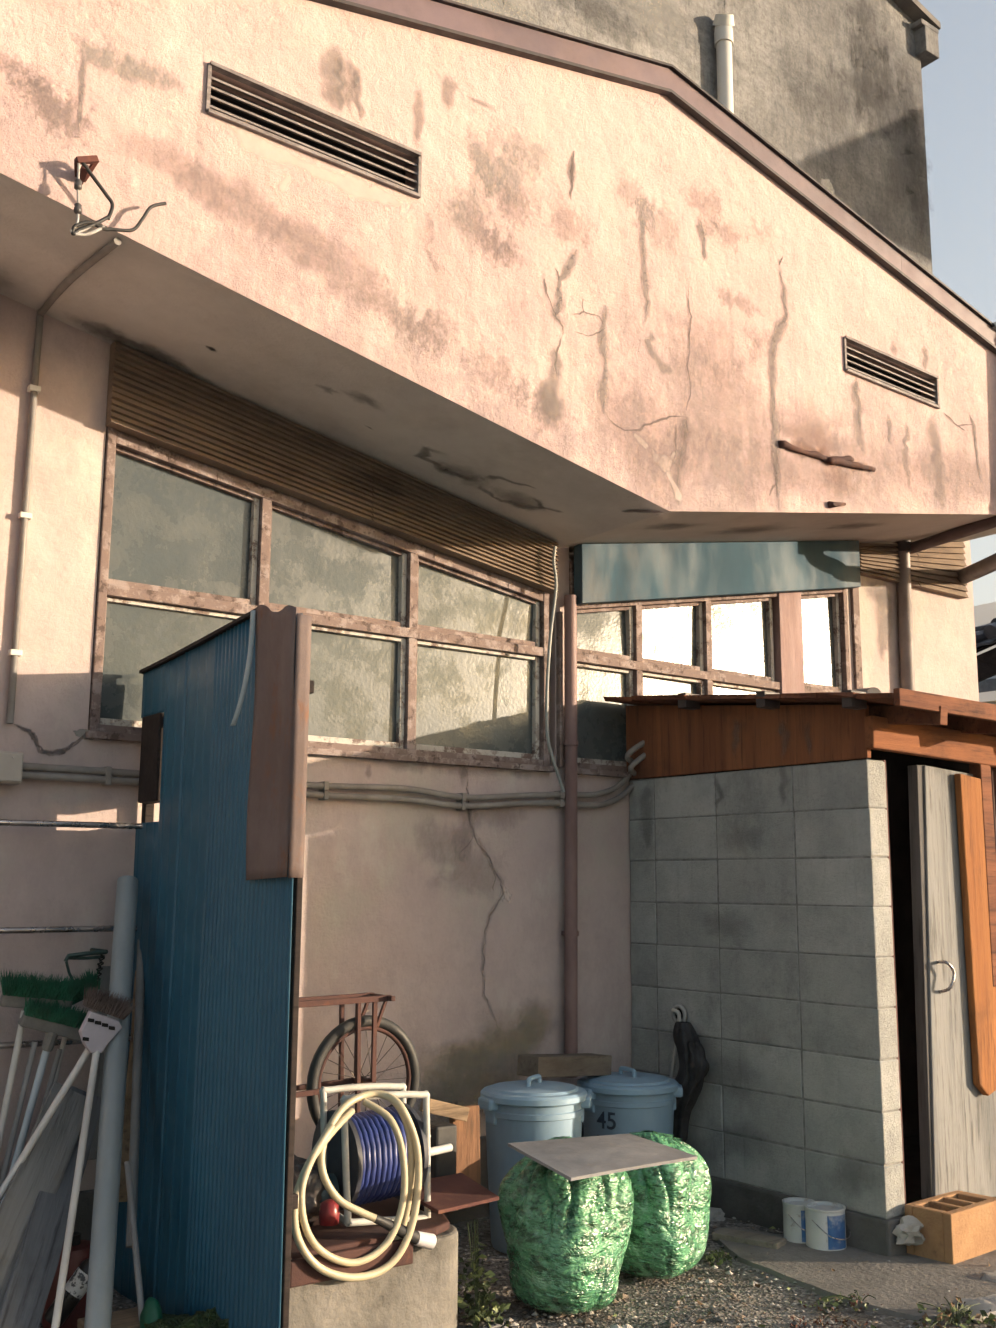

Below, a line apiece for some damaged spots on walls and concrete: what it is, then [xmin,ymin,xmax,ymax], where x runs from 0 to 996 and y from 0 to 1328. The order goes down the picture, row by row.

crack [697,224,706,258]
crack [544,253,692,513]
crack [769,257,788,496]
crack [460,788,504,1001]
leakage [434,1011,542,1109]